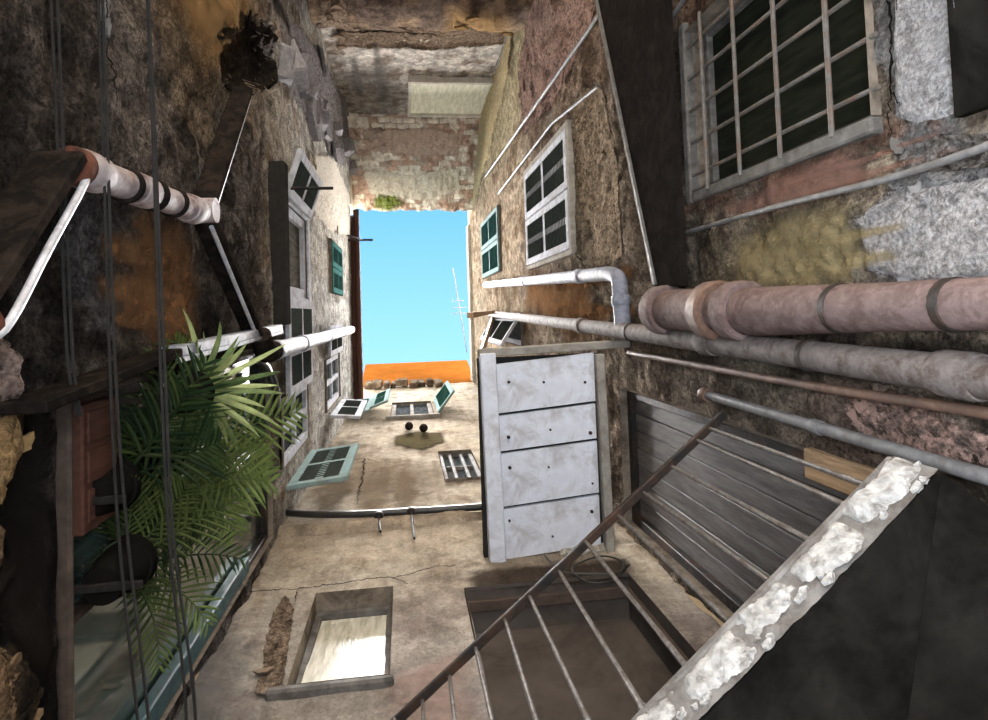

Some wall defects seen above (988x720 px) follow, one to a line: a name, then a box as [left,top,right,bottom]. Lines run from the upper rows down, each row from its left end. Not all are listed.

damp [273,0,308,31]
flaking render [217,10,462,236]
flaking render [316,0,595,207]
flaking render [571,77,623,268]
flaking render [857,133,988,282]
flaking render [0,415,35,504]
damp [394,432,444,449]
flaking render [0,647,23,720]
flaking render [252,596,294,695]